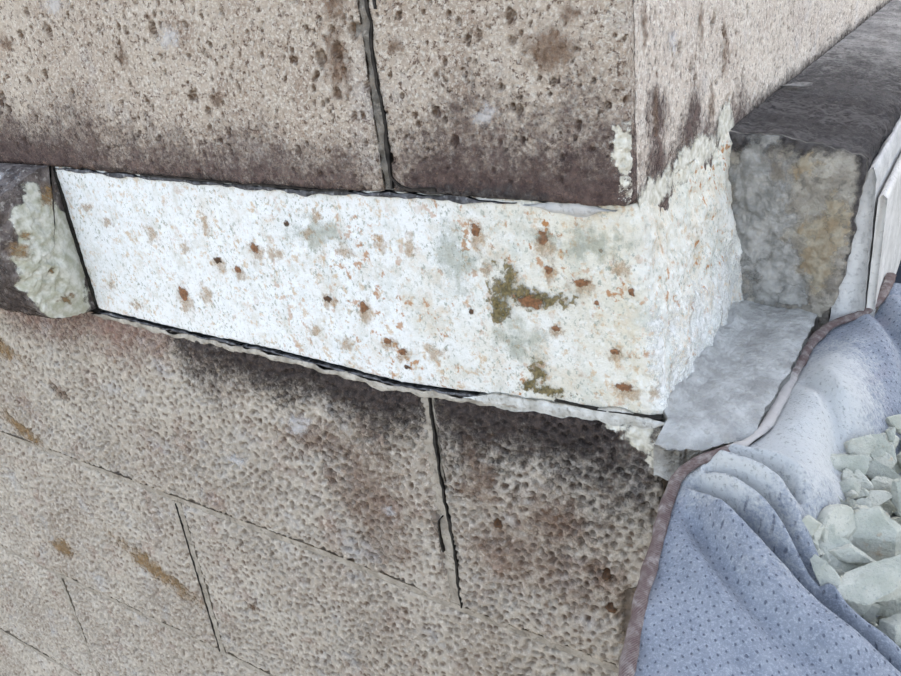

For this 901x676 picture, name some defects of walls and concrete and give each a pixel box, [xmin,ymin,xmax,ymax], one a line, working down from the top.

damp [0,105,373,191]
damp [392,0,901,308]
spalling [8,182,90,318]
damp [0,265,425,454]
corrosion [512,295,542,310]
corrosion [536,231,548,245]
crack [428,398,463,609]
damp [435,396,662,512]